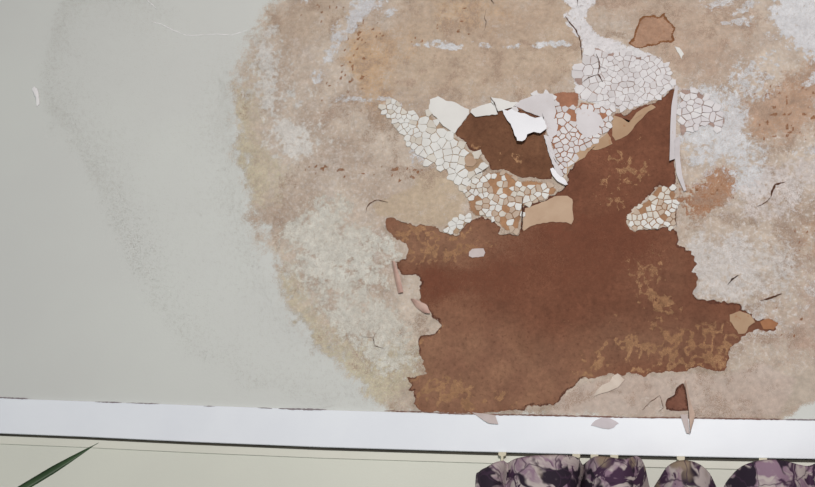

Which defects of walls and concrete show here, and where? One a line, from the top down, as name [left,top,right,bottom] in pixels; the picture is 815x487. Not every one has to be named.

peeling [629,13,676,48]
leakage [224,0,815,420]
peeling [385,89,778,414]
peeling [665,383,690,434]